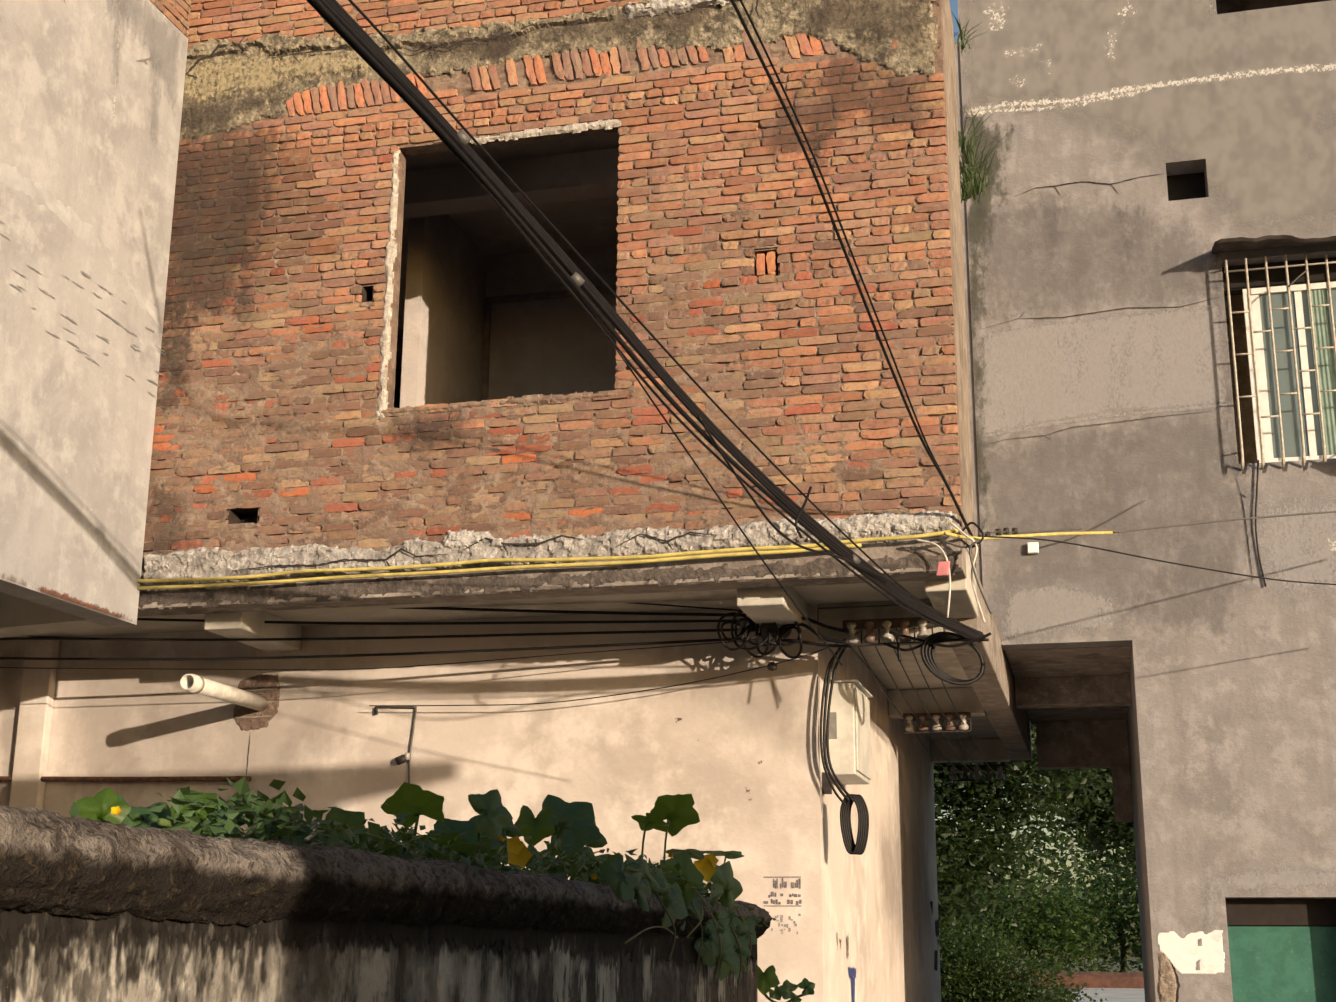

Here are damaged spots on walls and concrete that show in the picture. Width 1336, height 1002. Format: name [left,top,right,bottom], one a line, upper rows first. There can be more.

spalling [625,0,729,20]
crack [1016,174,1159,196]
crack [983,297,1219,329]
spalling [443,529,503,549]
flaking render [233,674,280,731]
damp [0,909,758,1002]
peeling [1157,930,1225,1002]